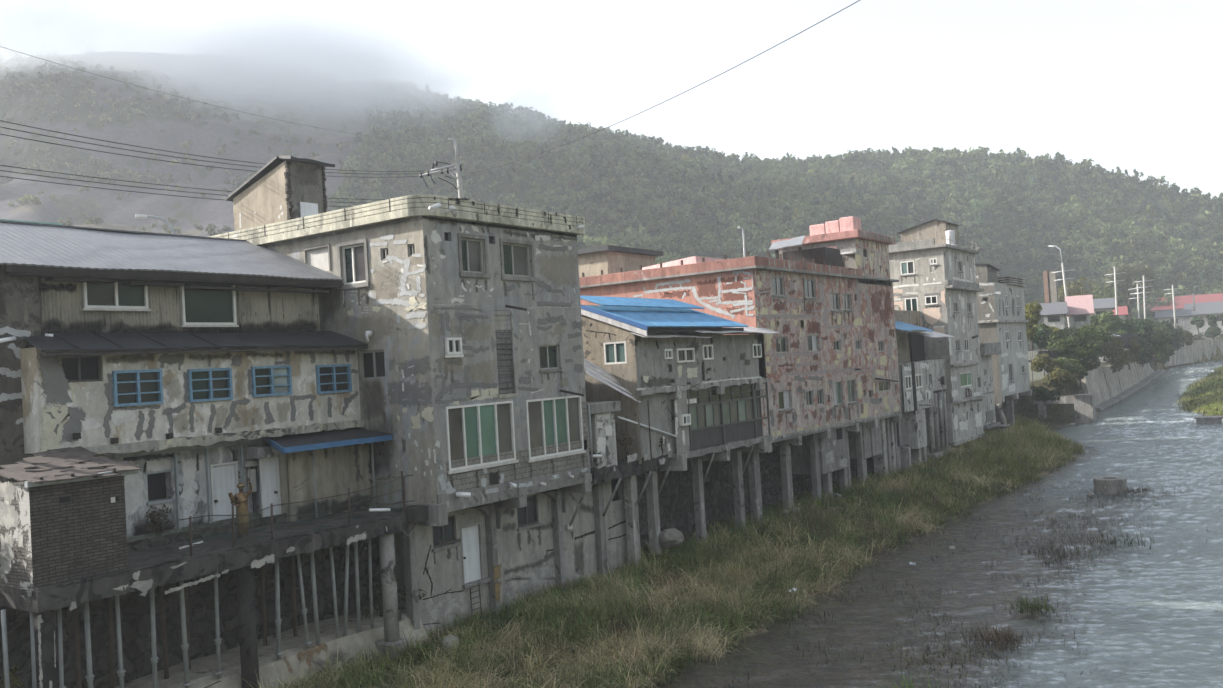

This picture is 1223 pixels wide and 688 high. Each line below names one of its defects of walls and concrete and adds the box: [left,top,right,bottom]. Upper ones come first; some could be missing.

damp [106,354,154,363]
damp [41,288,369,333]
peeling [342,230,446,321]
peeling [451,281,494,303]
peeling [527,232,572,255]
peeling [702,289,807,383]
peeling [39,385,165,452]
damp [293,383,406,481]
peeling [384,365,443,476]
peeling [453,387,509,405]
crack [423,545,463,625]